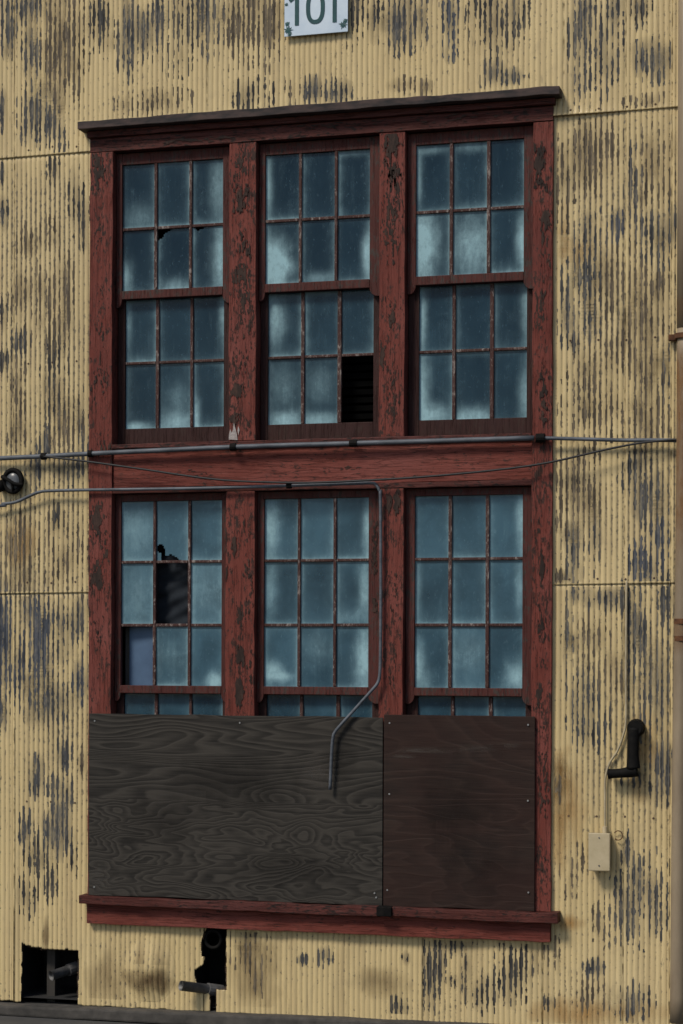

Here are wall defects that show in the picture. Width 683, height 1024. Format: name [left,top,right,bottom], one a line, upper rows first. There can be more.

peeling [380,133,403,265]
peeling [0,0,353,921]
peeling [533,0,677,818]
peeling [371,520,400,615]
peeling [538,829,585,900]